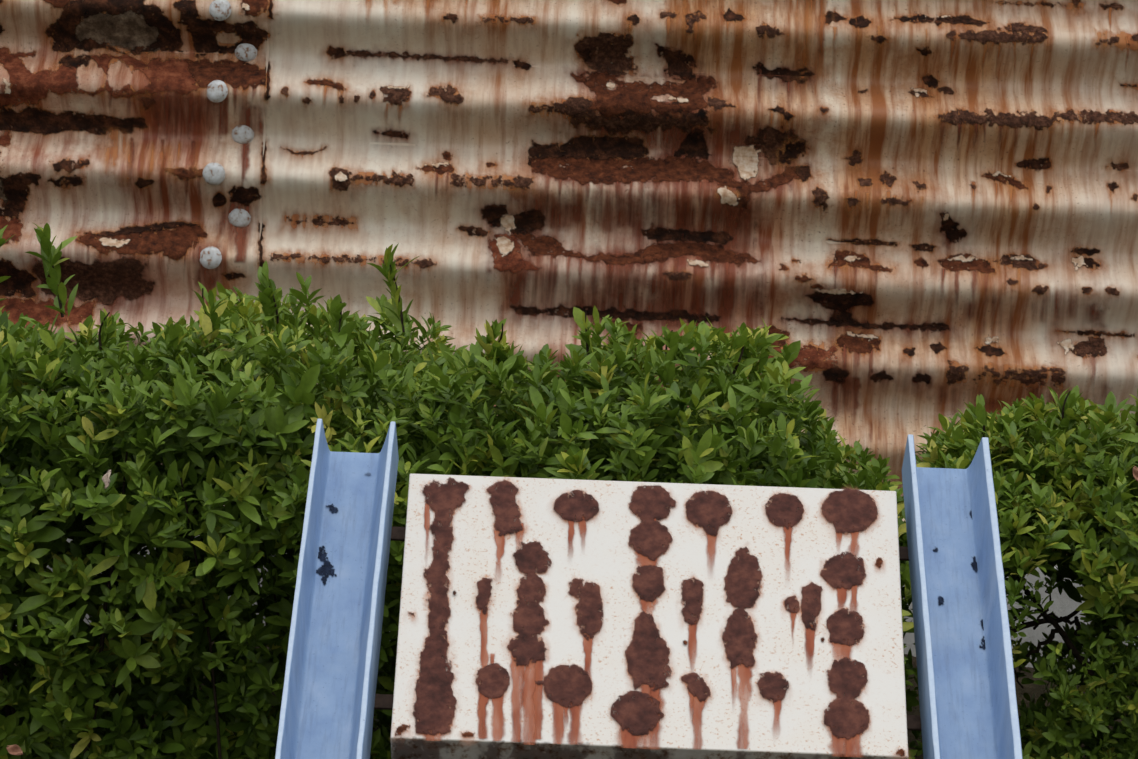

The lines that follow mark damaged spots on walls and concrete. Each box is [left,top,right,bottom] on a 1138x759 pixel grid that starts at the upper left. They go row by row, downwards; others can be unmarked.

rust [326,46,345,59]
rust [915,29,931,56]
rust [1095,3,1138,63]
rust [303,78,412,114]
rust [911,73,954,97]
rust [936,108,1138,144]
rust [349,0,891,341]
rust [843,149,927,213]
rust [0,144,261,328]
rust [283,213,358,230]
rust [271,251,437,270]
rust [752,250,896,411]